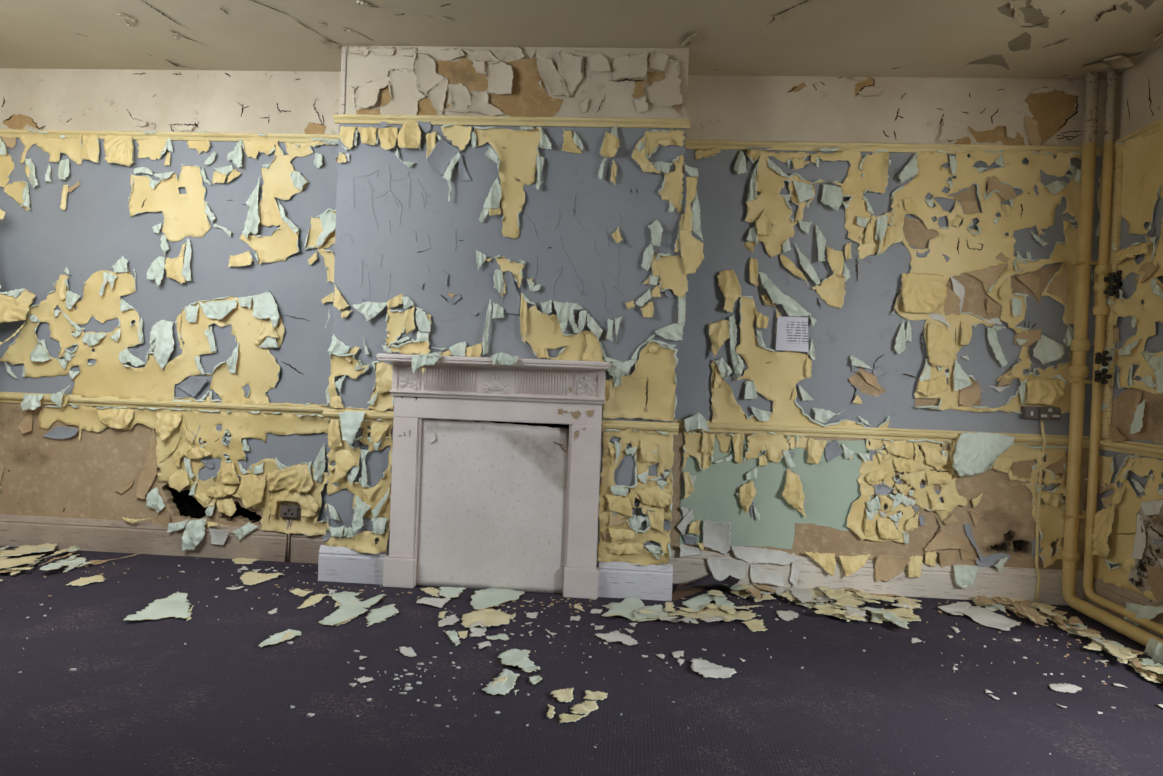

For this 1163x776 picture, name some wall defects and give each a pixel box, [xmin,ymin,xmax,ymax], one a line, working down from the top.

crack [253,0,454,72]
peeling [997,0,1067,52]
peeling [1096,0,1156,21]
peeling [0,45,1082,588]
peeling [1078,127,1163,626]
water stain [1127,499,1163,602]
peeling [1144,638,1163,664]